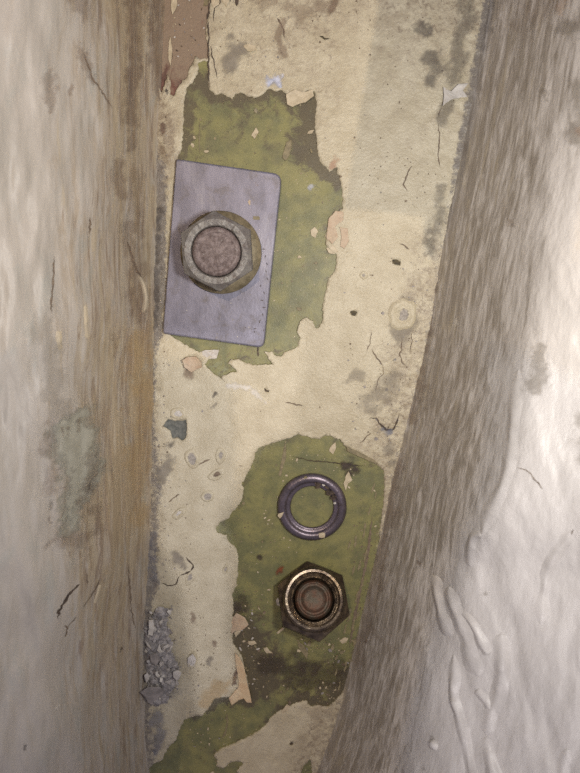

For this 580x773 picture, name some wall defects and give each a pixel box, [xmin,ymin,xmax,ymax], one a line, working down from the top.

peeling [161,0,349,379]
crack [367,332,384,391]
spalling [163,419,187,440]
crack [360,416,399,443]
crack [57,574,100,637]
crack [162,558,194,586]
peeling [149,434,385,773]
spalling [140,607,181,707]